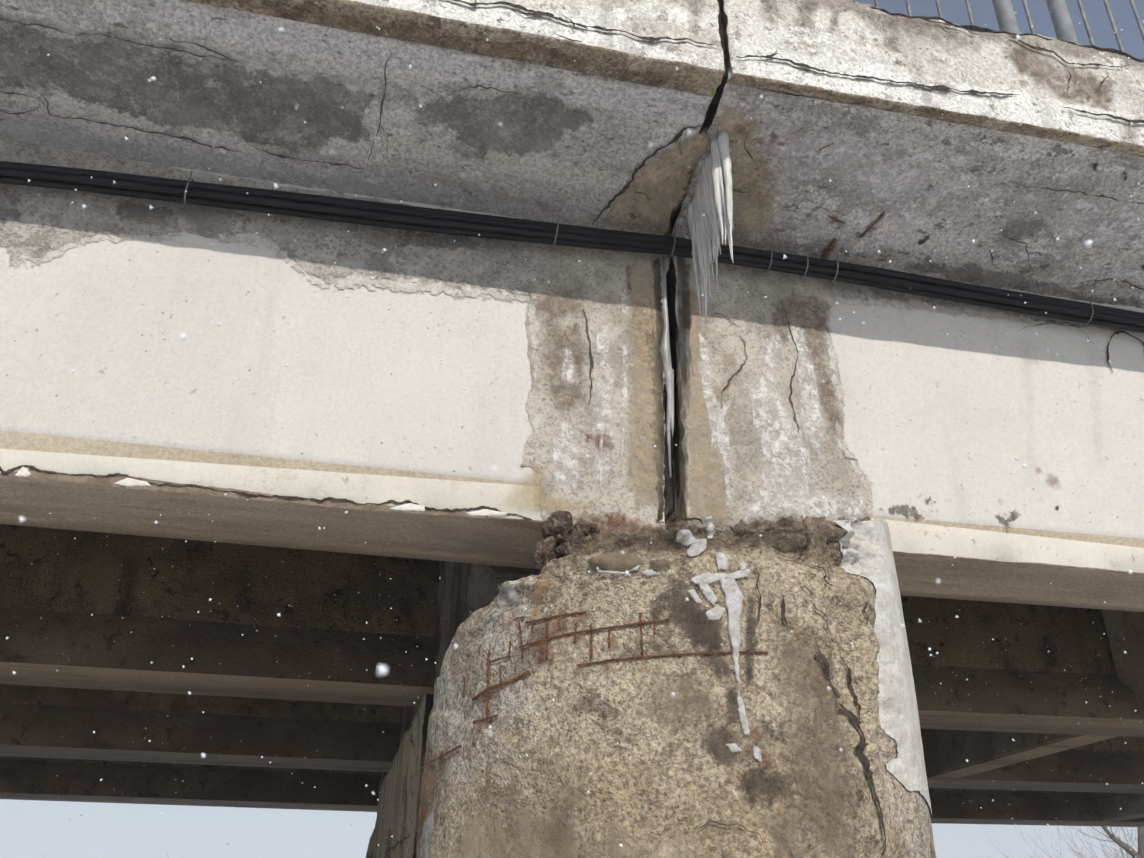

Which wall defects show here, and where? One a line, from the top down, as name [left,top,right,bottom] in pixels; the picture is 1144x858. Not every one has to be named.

leakage [0,14,383,164]
crack [448,0,1019,96]
crack [1011,36,1144,123]
peeling [0,138,411,206]
crack [592,125,705,225]
spalling [602,132,708,233]
spalling [718,106,780,235]
peeling [0,183,1142,818]
leakage [651,578,730,673]
leakage [746,589,758,680]
leakage [701,688,739,763]
crack [658,516,886,858]